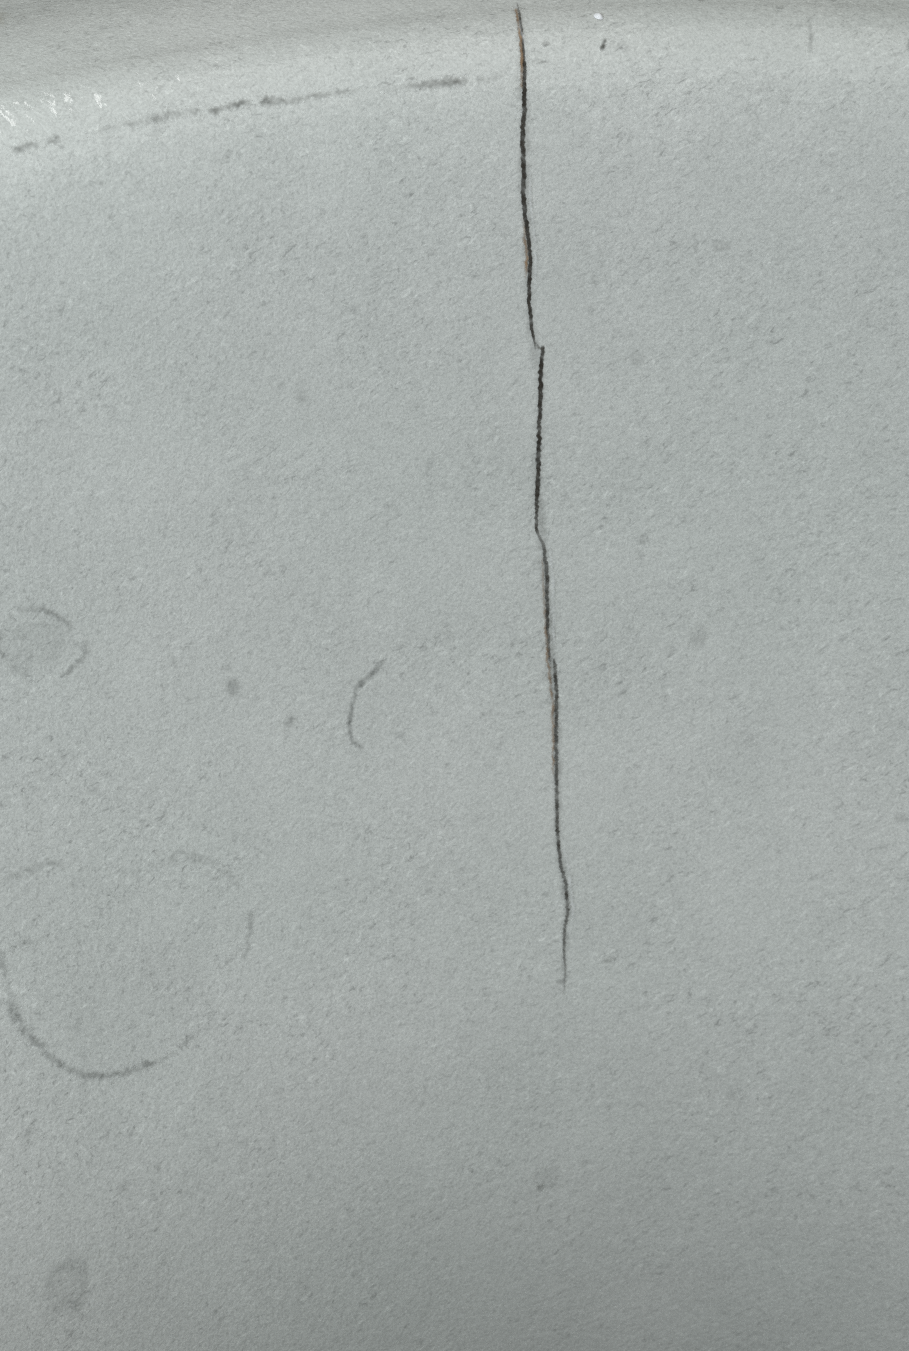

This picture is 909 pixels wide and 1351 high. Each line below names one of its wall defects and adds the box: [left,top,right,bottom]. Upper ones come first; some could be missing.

crack [515,9,571,943]